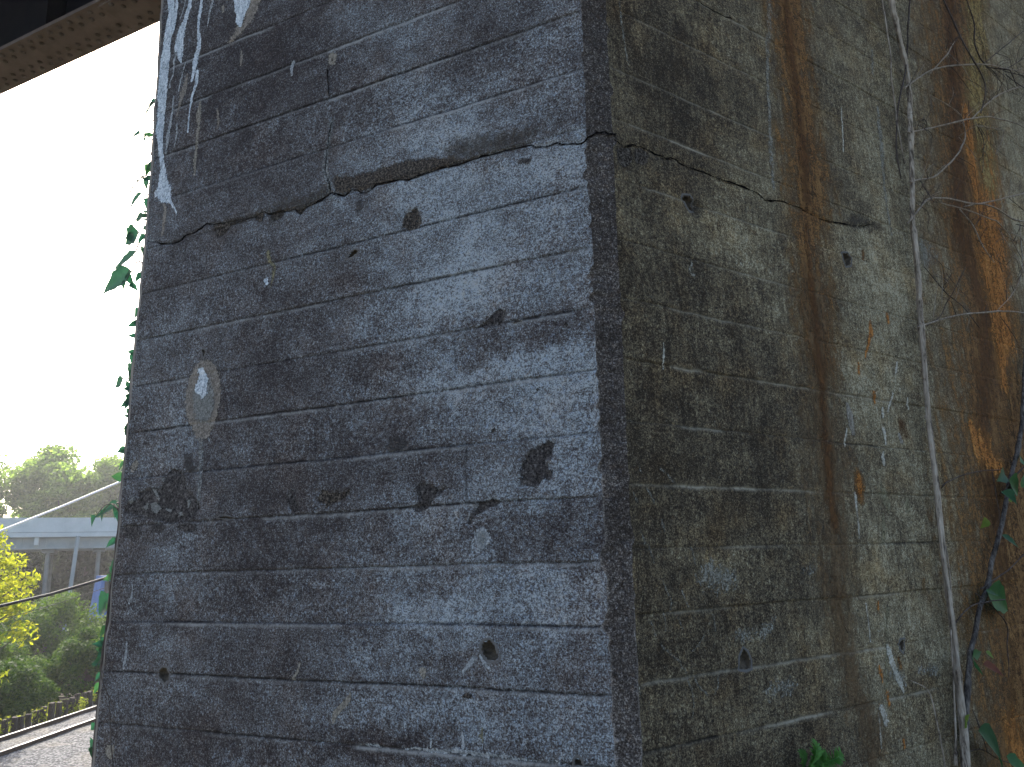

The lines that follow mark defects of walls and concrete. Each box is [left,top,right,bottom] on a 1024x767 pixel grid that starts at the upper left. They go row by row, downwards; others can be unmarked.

leakage [154,0,261,236]
spalling [214,126,536,238]
crack [150,120,871,244]
rust [913,0,1024,767]
peeling [123,469,200,539]
peeling [520,441,555,487]